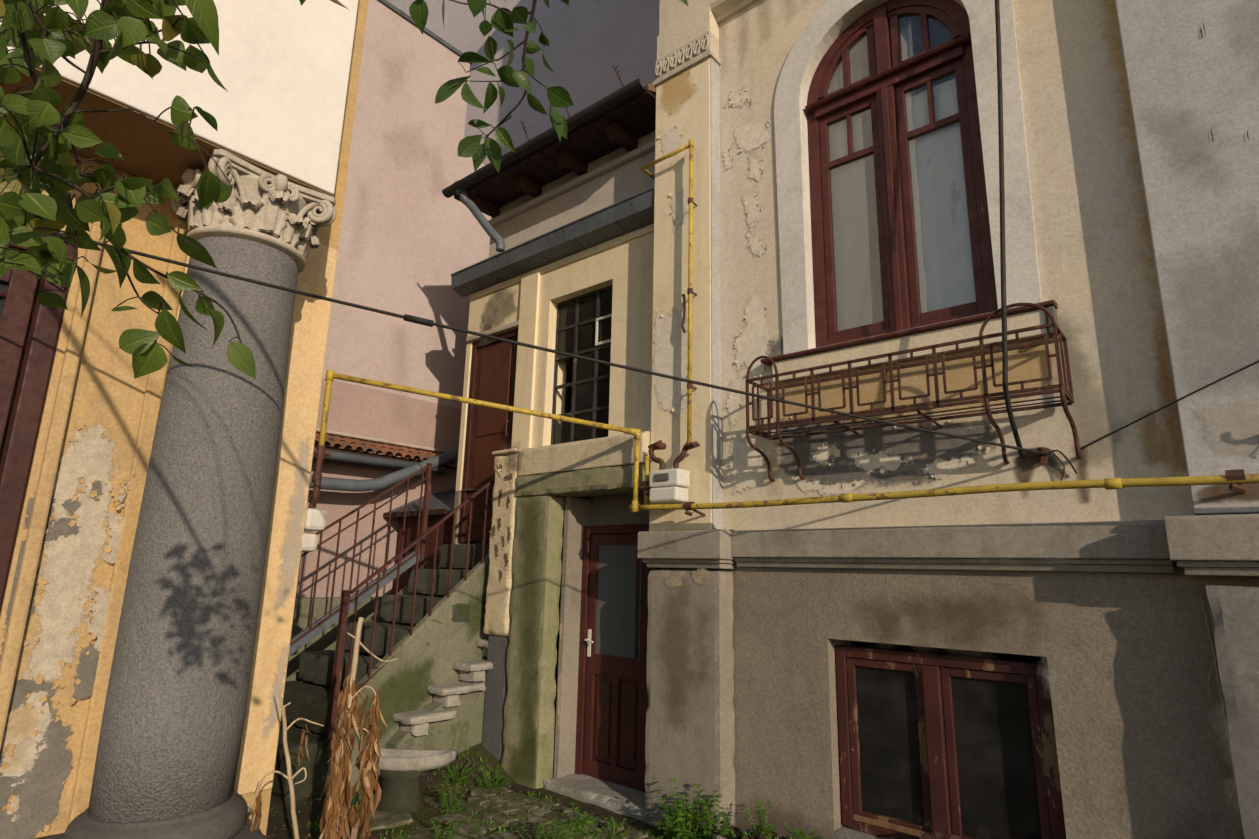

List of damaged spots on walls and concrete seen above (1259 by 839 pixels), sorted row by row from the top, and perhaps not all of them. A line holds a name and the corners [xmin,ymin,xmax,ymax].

peeling [657,71,696,156]
peeling [669,188,688,232]
peeling [722,120,771,257]
peeling [652,303,693,417]
peeling [0,423,146,839]
damp [511,746,536,781]